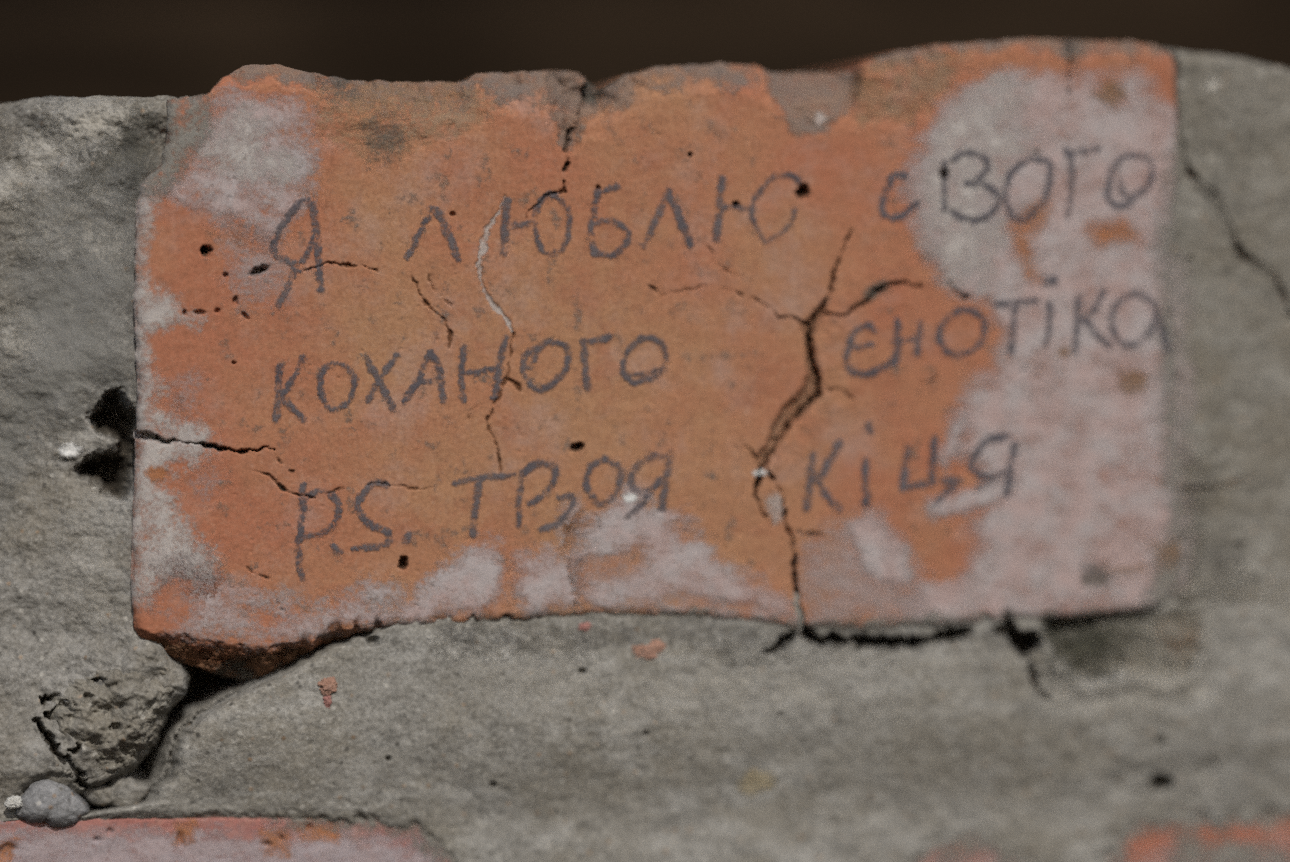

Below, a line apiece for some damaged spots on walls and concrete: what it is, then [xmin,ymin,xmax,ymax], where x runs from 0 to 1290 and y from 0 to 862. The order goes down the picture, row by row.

crack [1182,148,1215,193]
crack [412,277,452,348]
crack [476,129,570,473]
crack [1233,234,1286,301]
damp [0,43,1232,731]
crack [707,235,920,593]
crack [134,432,341,498]
crack [993,618,1013,636]